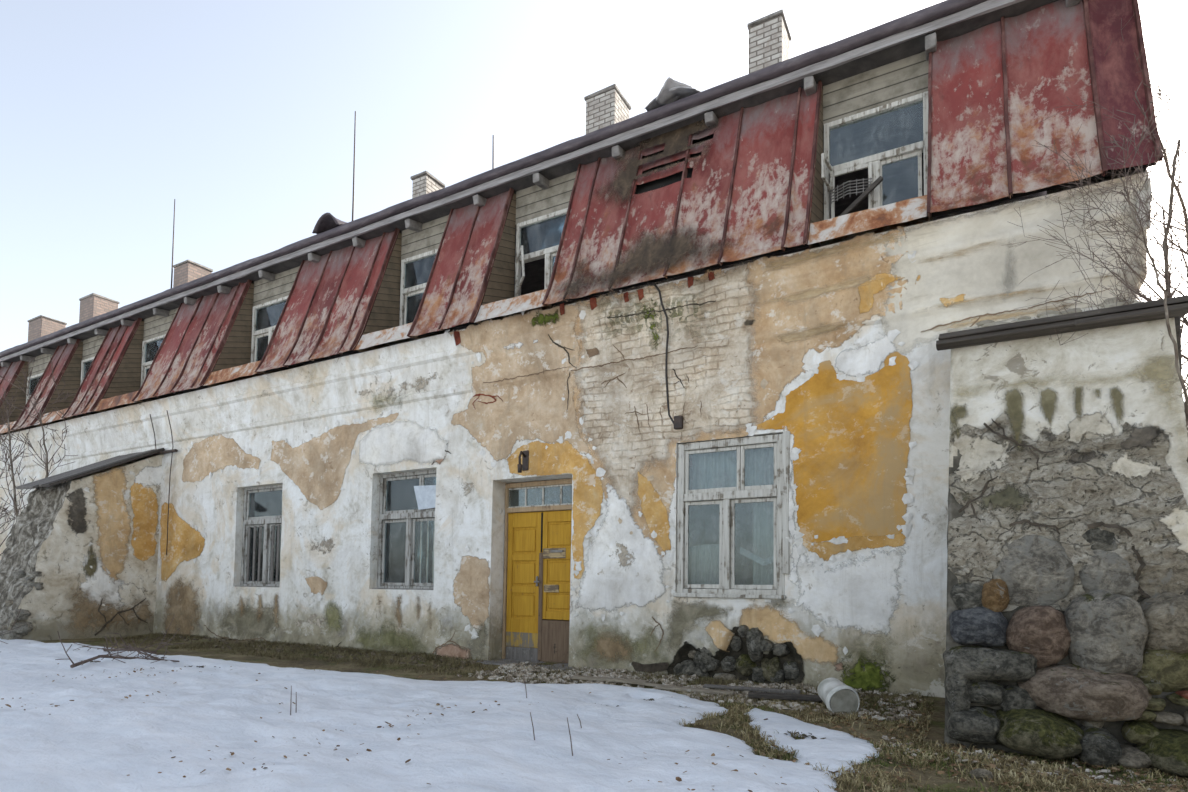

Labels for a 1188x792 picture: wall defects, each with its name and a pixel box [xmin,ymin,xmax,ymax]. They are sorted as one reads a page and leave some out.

corrosion [558,229,723,315]
flaking render [182,372,436,510]
crack [472,300,716,431]
flaking render [443,178,1145,571]
damp [950,391,968,437]
crack [984,419,1055,470]
damp [1005,380,1057,449]
damp [1075,386,1124,423]
flaking render [436,545,490,659]
flaking render [631,599,848,685]
crack [1009,519,1060,534]
crack [1087,521,1151,599]